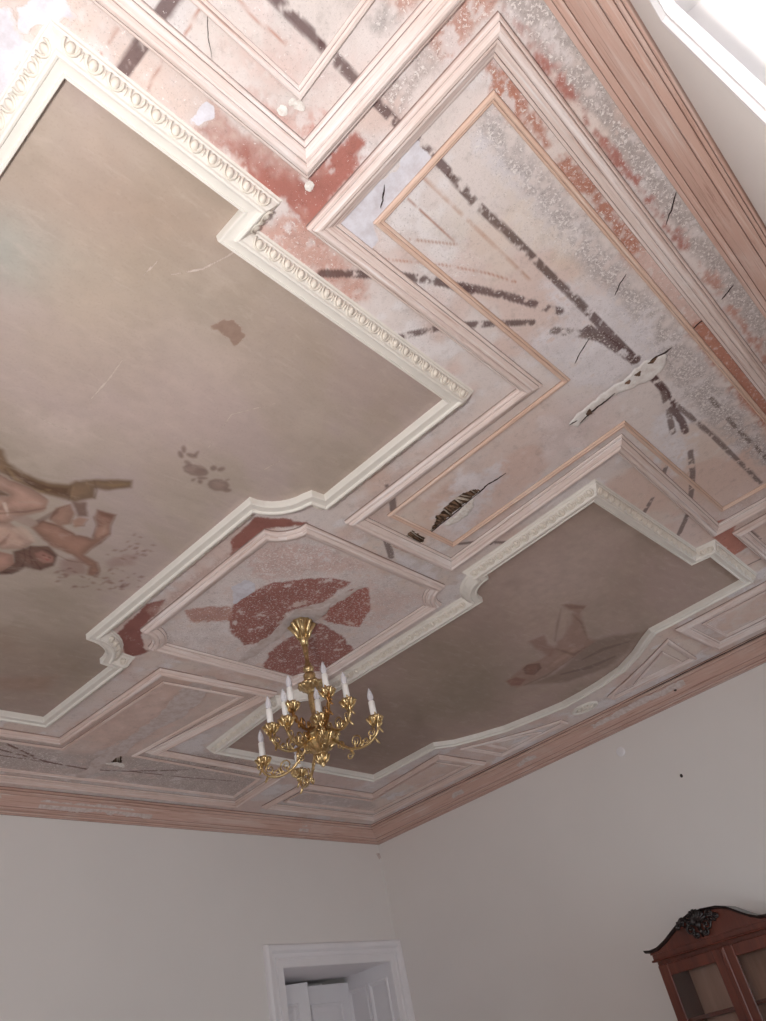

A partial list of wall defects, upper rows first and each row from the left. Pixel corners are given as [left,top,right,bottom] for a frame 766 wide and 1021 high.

flaking render [0,0,79,96]
leakage [210,318,246,347]
flaking render [231,580,256,604]